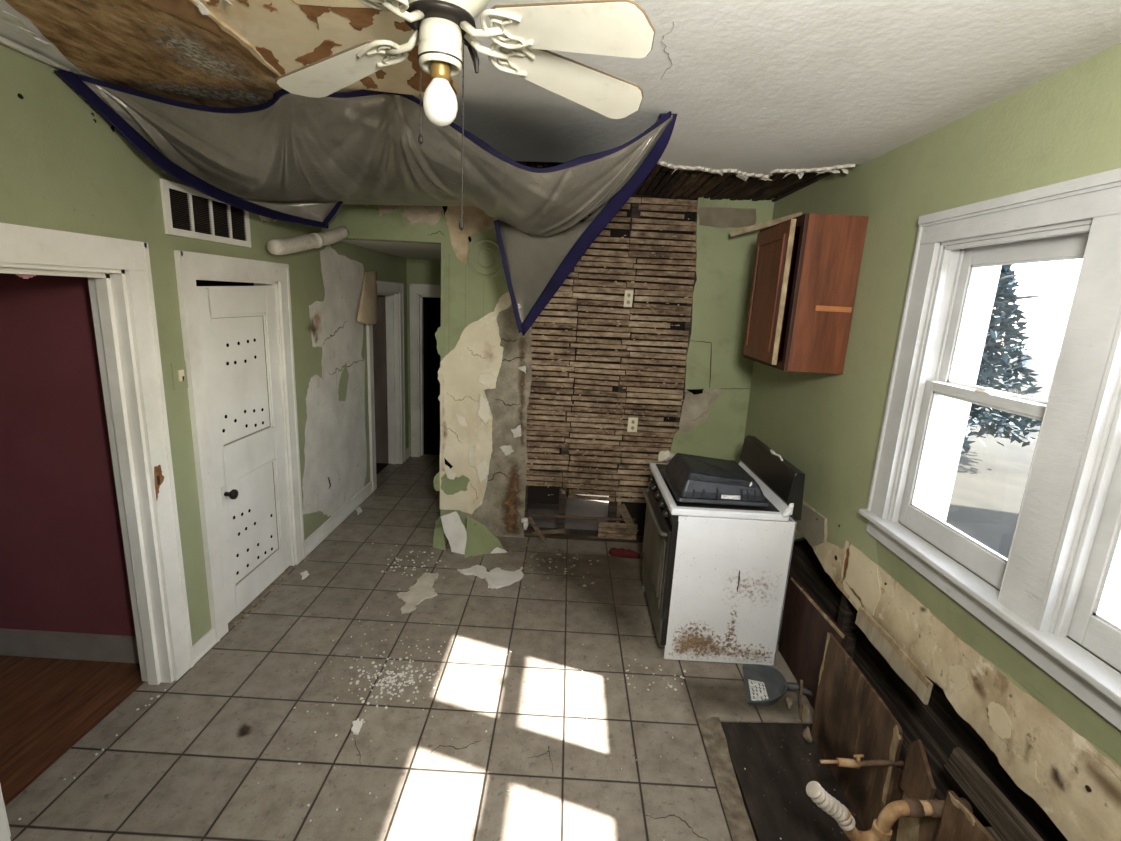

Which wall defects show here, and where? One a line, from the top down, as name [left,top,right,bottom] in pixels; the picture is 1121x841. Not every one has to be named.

flaking render [2,0,432,108]
peeling [449,76,459,96]
flaking render [657,161,855,181]
peeling [302,245,367,517]
peeling [433,291,532,538]
corrosion [674,611,770,661]
peeling [988,702,1011,739]